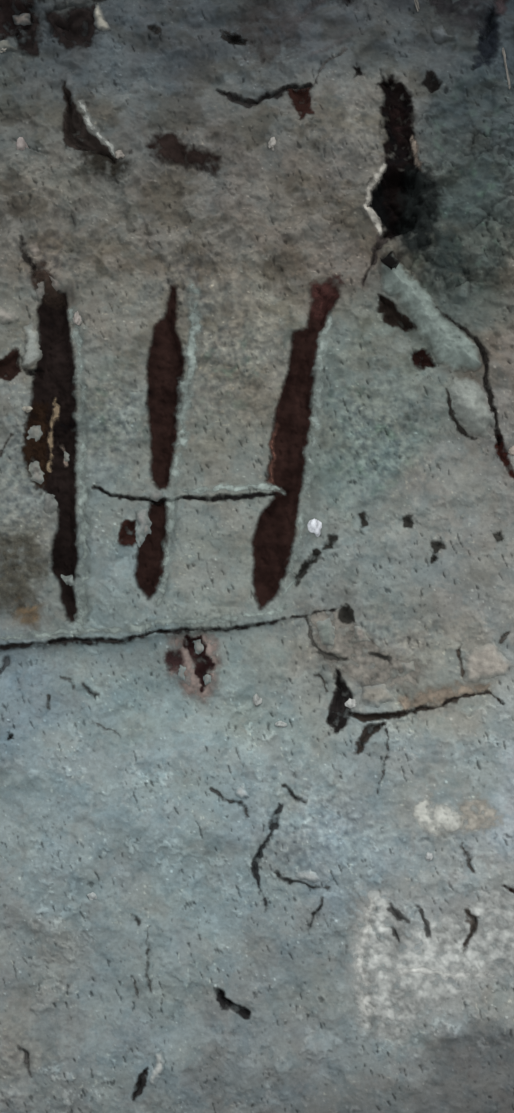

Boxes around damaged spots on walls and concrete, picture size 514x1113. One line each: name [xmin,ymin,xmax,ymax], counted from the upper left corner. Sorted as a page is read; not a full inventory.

spalling [422,71,442,93]
spalling [362,75,502,443]
crack [326,669,503,793]